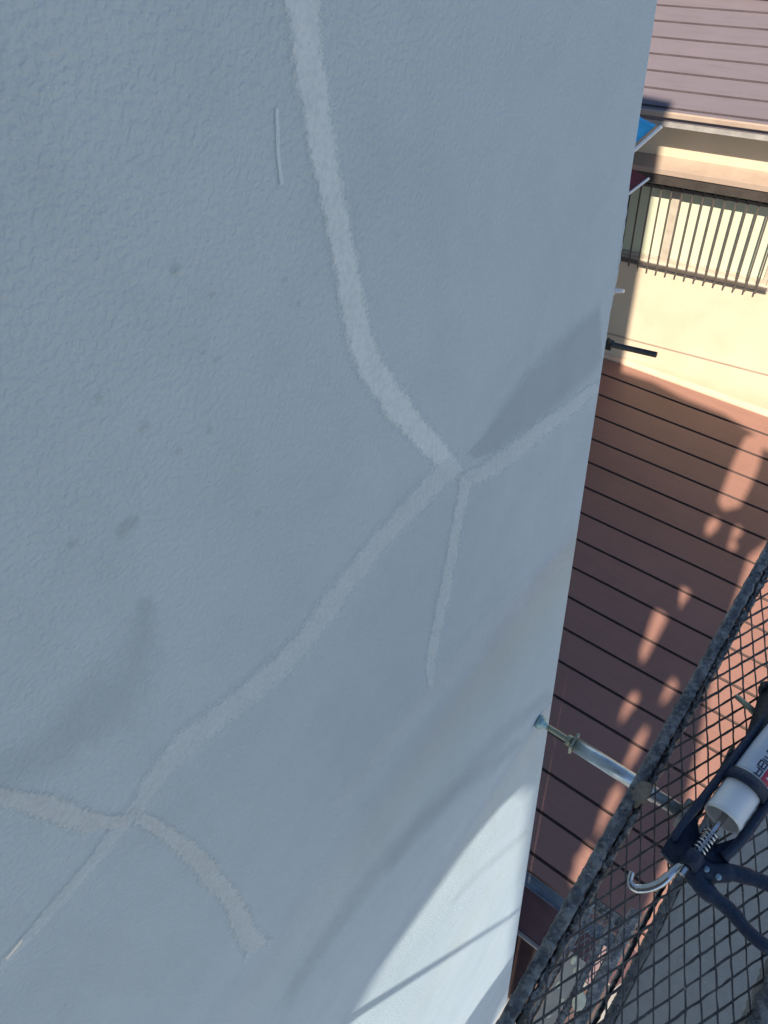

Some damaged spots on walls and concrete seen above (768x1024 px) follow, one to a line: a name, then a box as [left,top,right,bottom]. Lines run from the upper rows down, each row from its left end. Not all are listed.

crack [0,0,598,970]